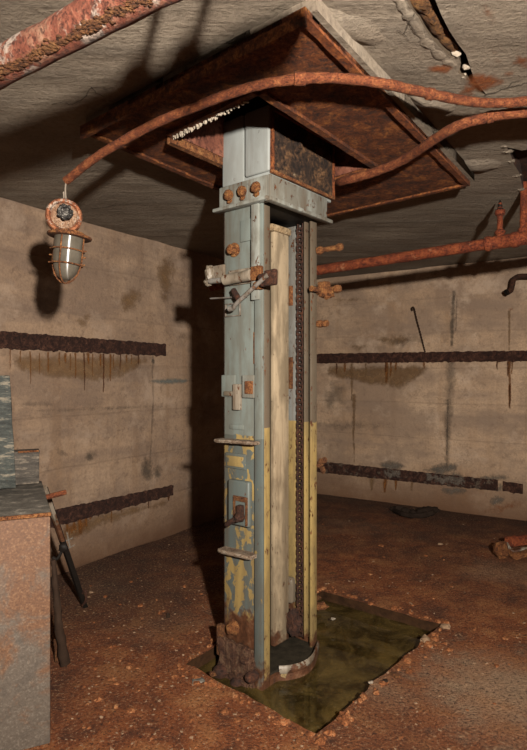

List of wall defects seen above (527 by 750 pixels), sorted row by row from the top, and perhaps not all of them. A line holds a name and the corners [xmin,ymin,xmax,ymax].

corrosion [10,350,141,392]
corrosion [329,362,425,449]